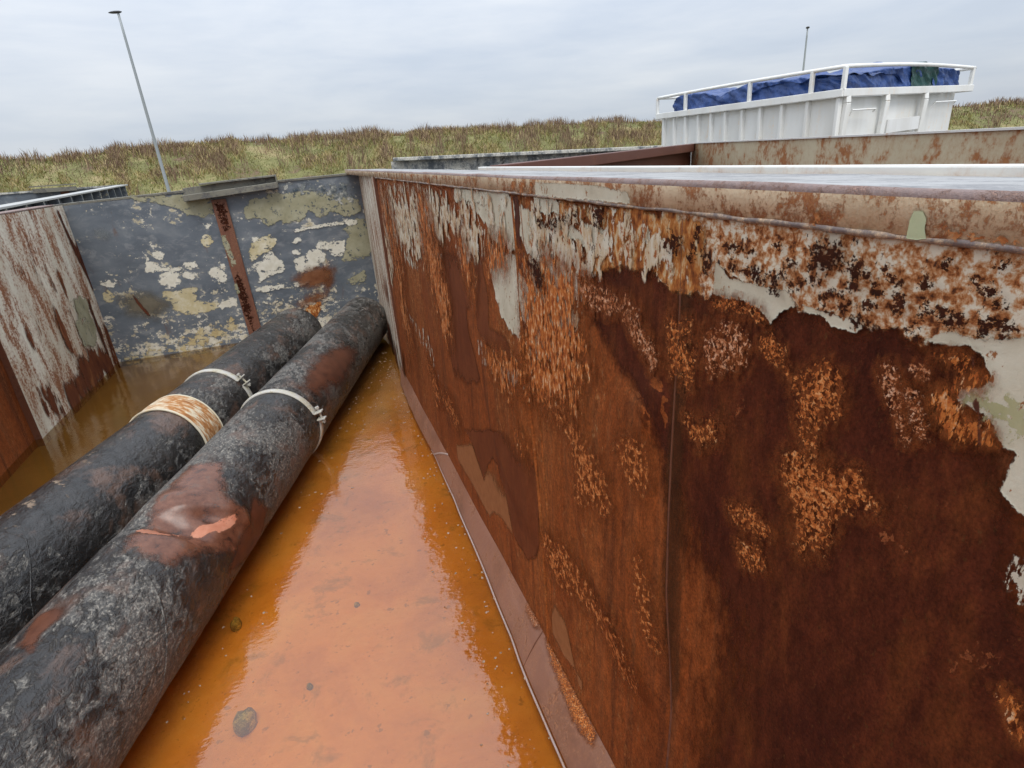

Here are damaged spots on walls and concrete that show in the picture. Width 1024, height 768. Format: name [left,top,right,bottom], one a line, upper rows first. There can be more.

corrosion [12,258,120,418]
peeling [100,279,117,303]
peeling [130,194,214,247]
peeling [124,250,245,362]
peeling [244,182,371,316]
corrosion [295,266,333,317]
peeling [380,182,688,371]
peeling [713,263,862,333]
peeling [906,210,926,240]
corrosion [378,173,1024,768]
peeling [924,332,1024,516]